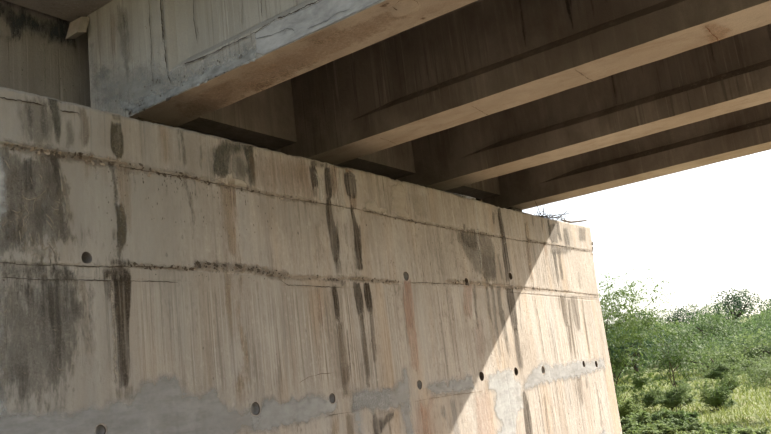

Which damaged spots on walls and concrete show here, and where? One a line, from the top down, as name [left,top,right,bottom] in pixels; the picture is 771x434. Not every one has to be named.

damp [111,123,123,158]
damp [214,142,255,184]
damp [344,172,363,270]
damp [498,208,510,275]
damp [104,181,131,386]
damp [332,284,343,318]
damp [354,282,373,387]
damp [506,286,523,367]
damp [523,391,533,434]